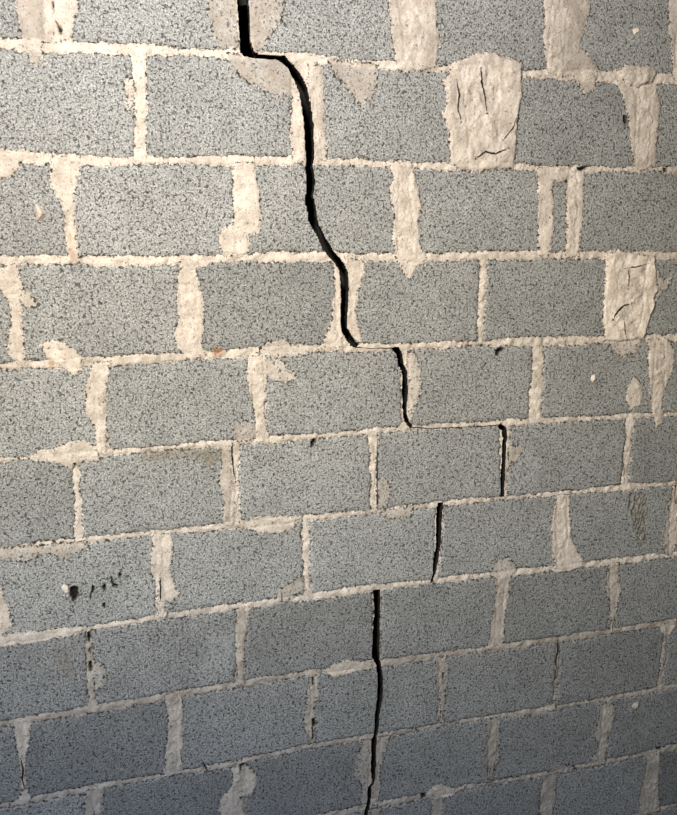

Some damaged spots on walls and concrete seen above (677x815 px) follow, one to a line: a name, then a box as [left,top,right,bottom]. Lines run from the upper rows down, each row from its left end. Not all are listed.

crack [235,0,509,496]
crack [230,443,238,481]
crack [373,436,381,507]
crack [429,502,445,583]
crack [362,589,384,815]